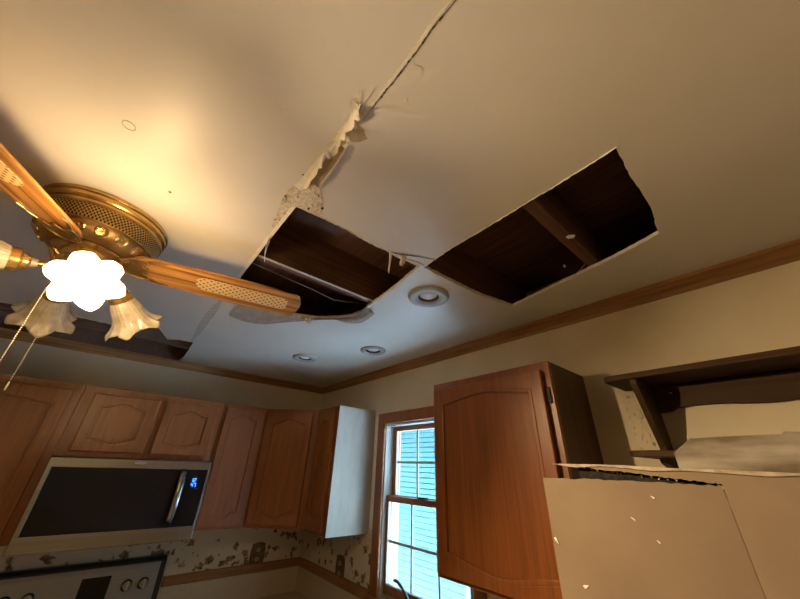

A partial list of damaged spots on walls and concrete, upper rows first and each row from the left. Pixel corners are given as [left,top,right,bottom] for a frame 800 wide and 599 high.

crack [361,0,456,120]
peeling [326,109,361,159]
spalling [272,184,324,228]